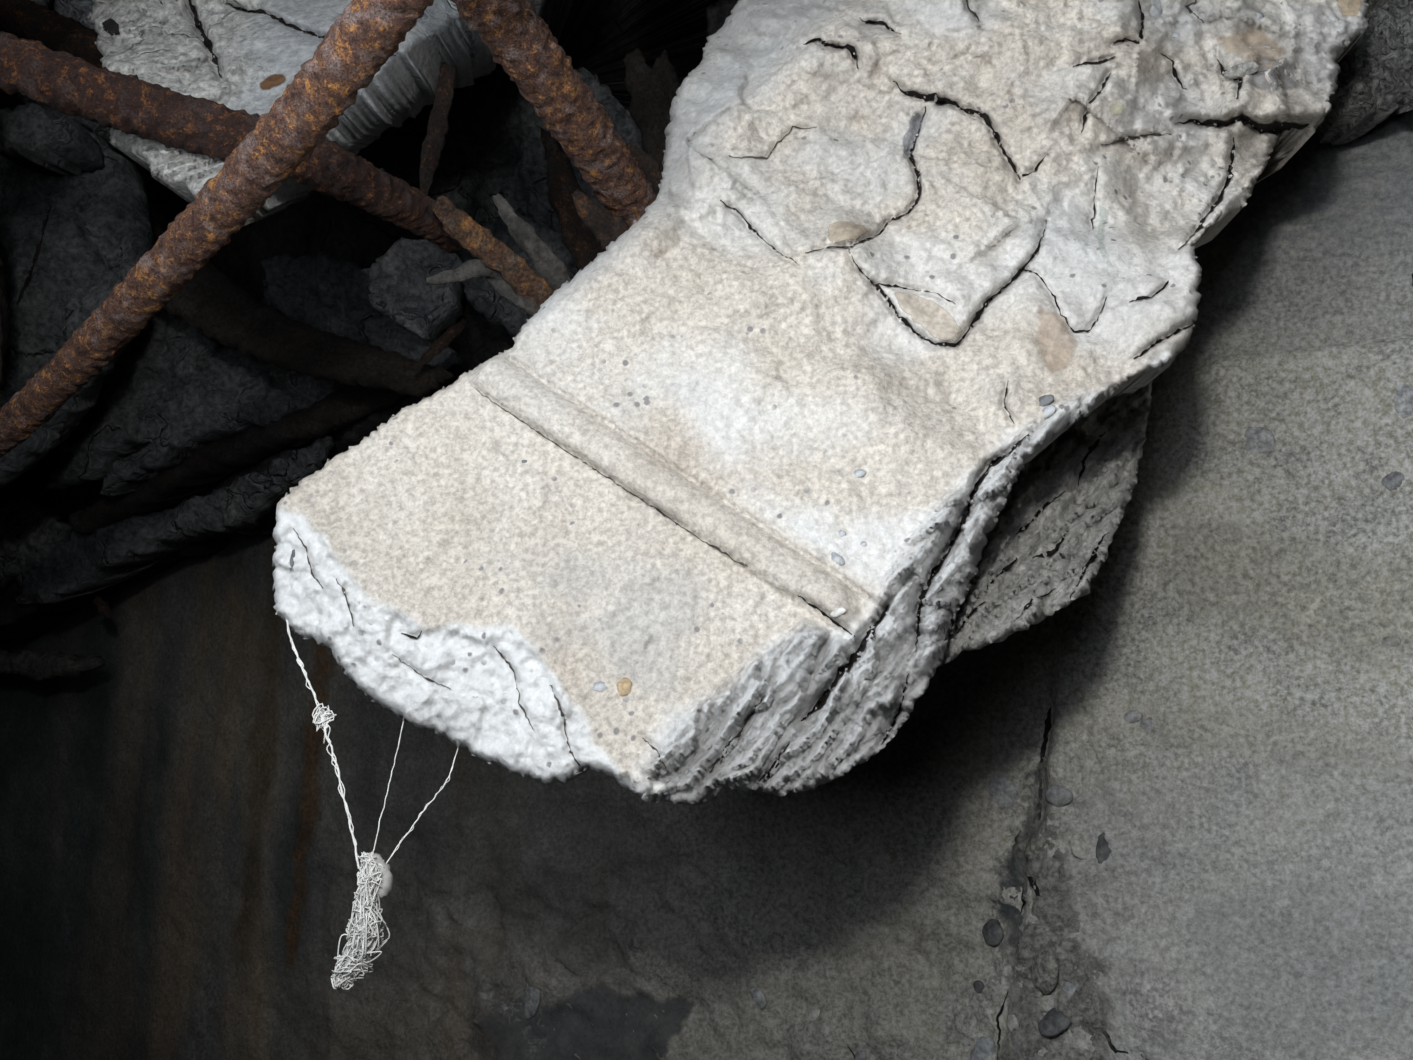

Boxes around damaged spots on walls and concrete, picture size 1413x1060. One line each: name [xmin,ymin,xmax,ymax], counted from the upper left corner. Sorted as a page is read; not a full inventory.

corrosion [151,221,167,243]
spalling [0,0,656,458]
corrosion [162,260,455,399]
crack [1012,706,1052,914]
water stain [470,963,693,1060]
crack [996,991,1008,1060]
crack [1102,1030,1148,1060]